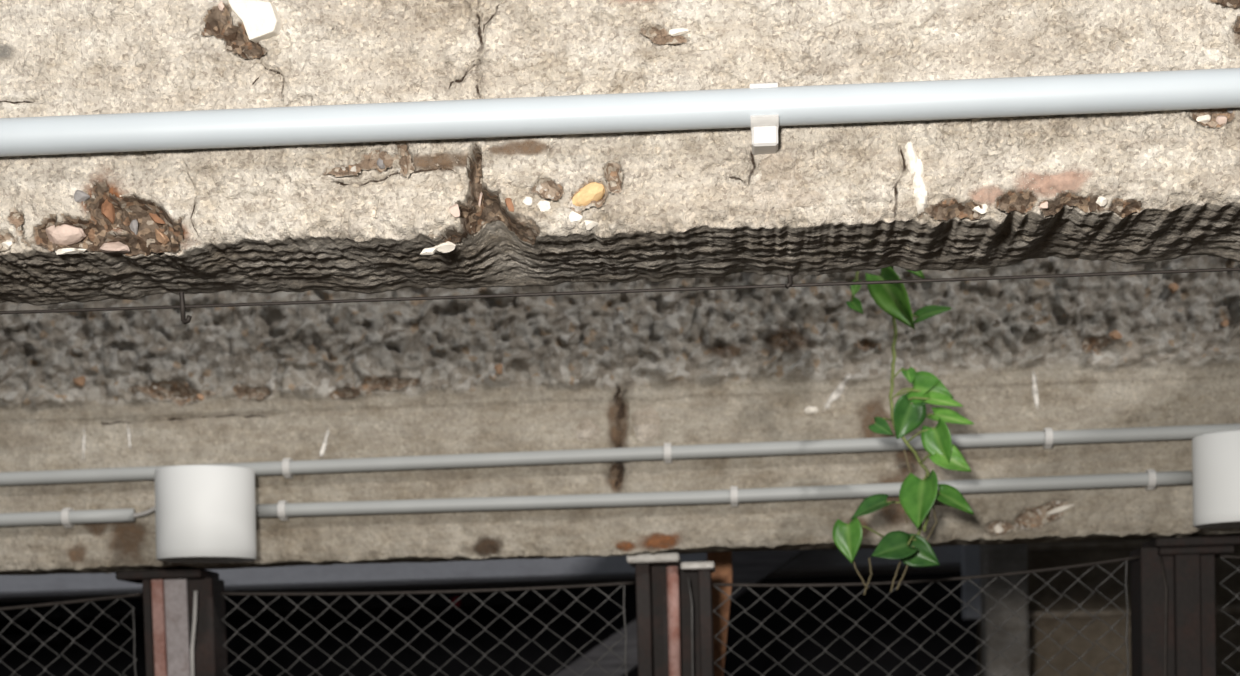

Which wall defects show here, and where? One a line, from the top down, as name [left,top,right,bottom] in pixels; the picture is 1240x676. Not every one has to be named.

crack [449,4,500,95]
spalling [1210,0,1240,33]
spalling [0,180,186,256]
spalling [420,143,623,255]
spalling [917,189,1143,221]